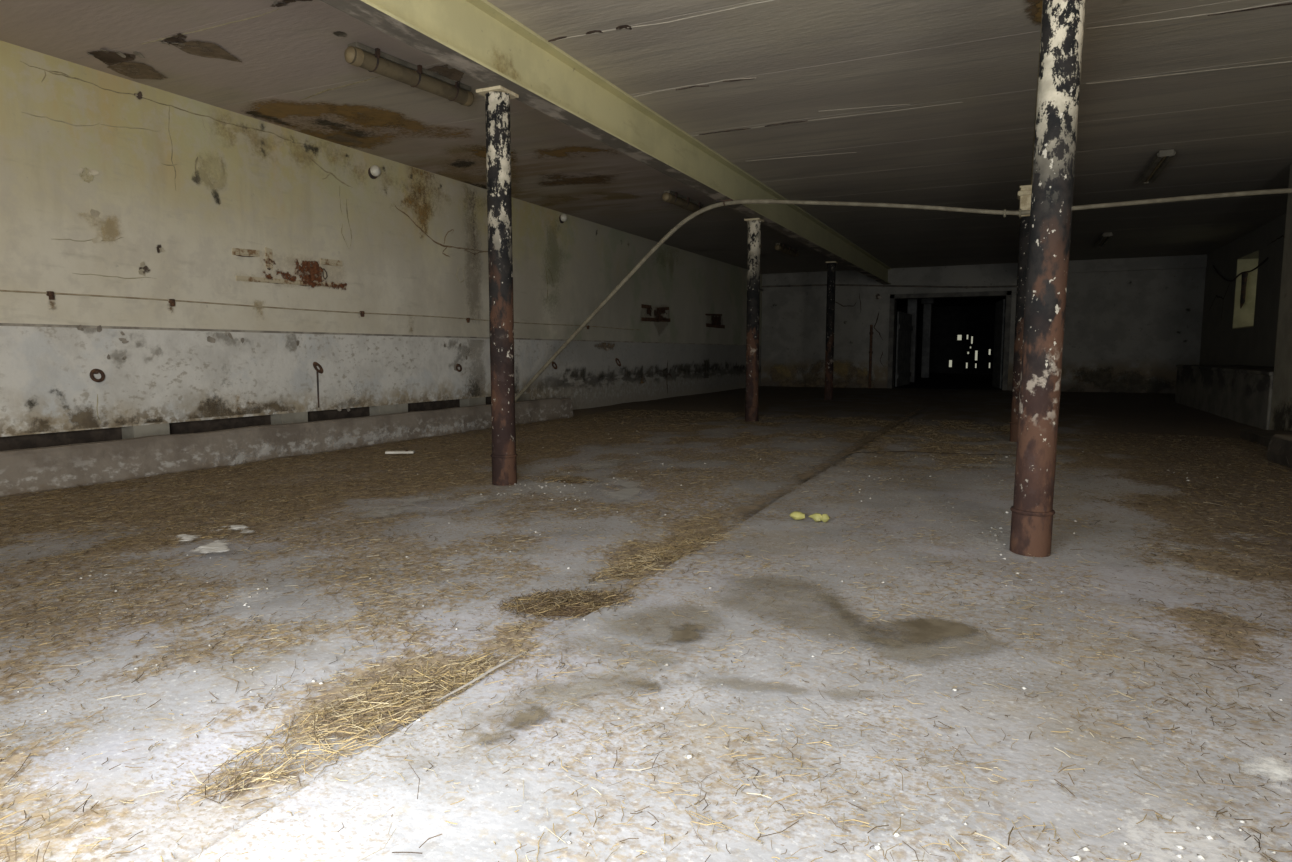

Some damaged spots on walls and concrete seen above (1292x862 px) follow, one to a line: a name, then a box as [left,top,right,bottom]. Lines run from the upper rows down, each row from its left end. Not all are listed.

spalling [159,33,241,62]
spalling [87,49,166,99]
leakage [247,100,486,167]
corrosion [232,247,347,290]
leakage [563,360,745,384]